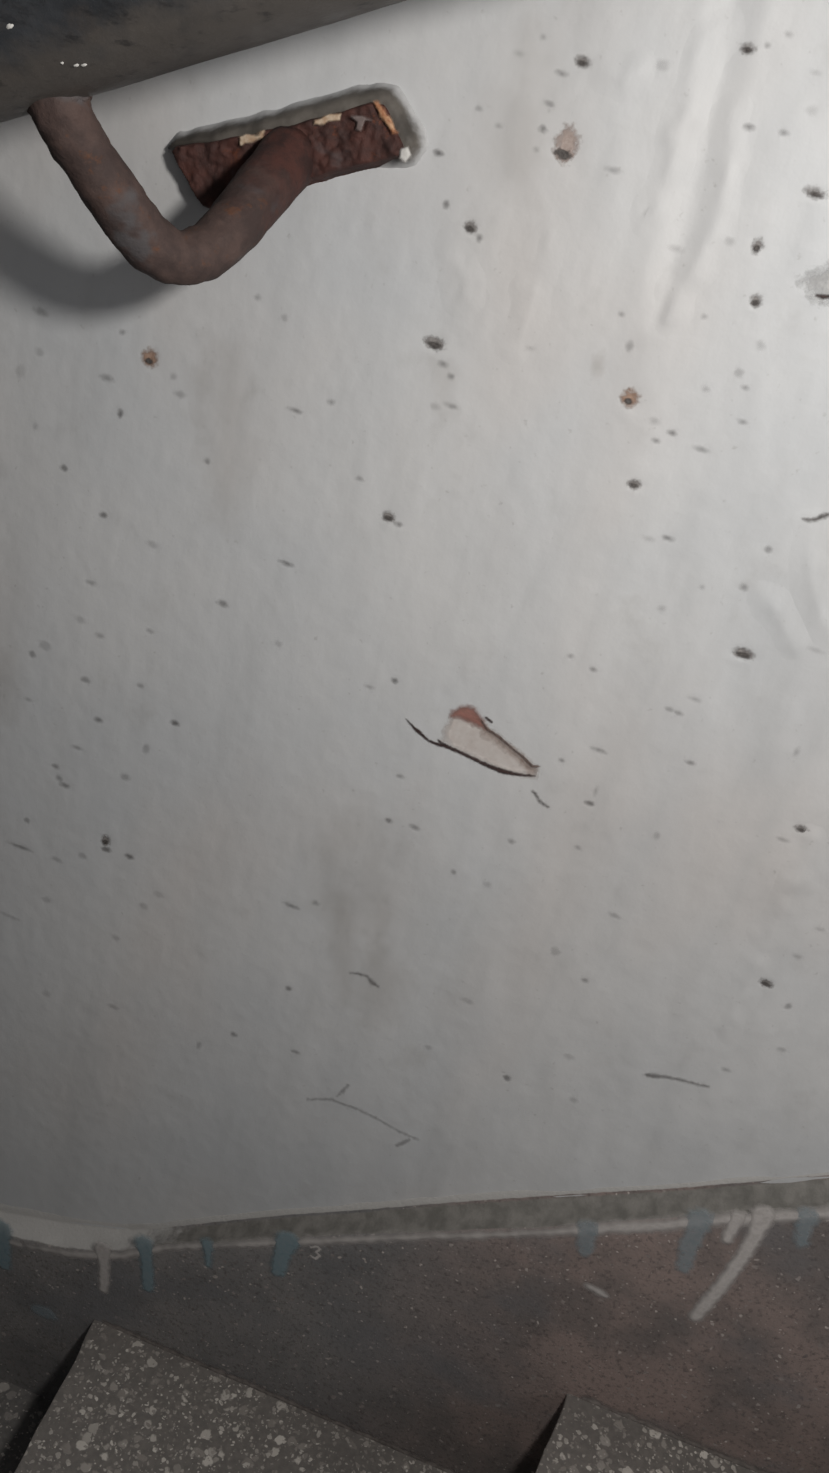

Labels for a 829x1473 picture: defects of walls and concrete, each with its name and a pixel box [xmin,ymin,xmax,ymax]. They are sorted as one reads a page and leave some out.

spalling [555,127,578,162]
flaking render [808,270,829,302]
peeling [407,706,540,777]